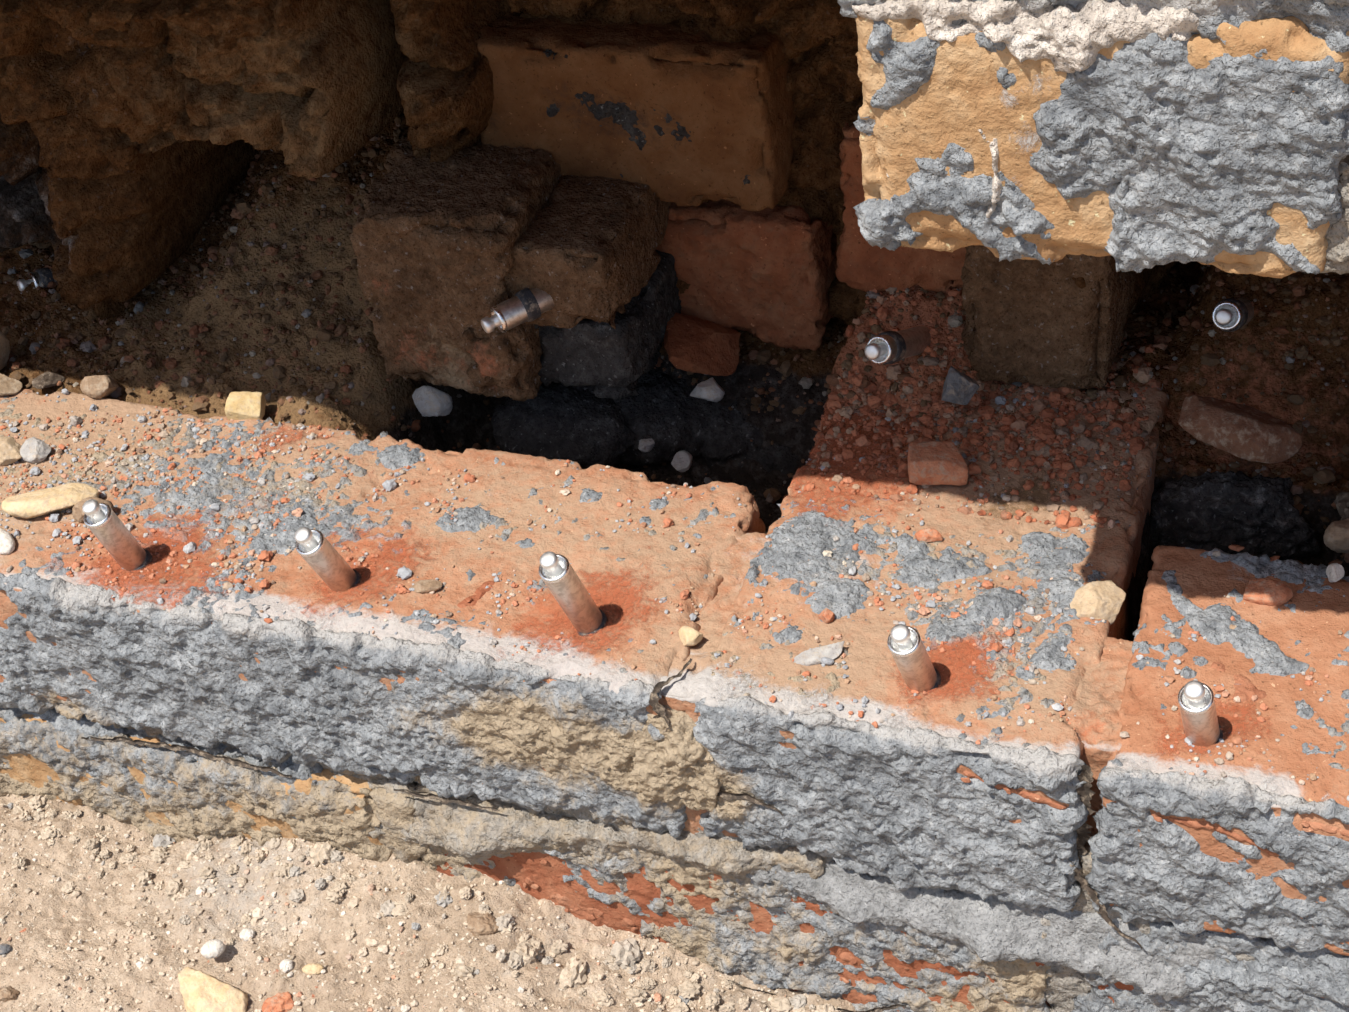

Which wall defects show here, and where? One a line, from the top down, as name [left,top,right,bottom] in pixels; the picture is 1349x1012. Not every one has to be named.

crack [1339,155,1349,187]
spalling [462,175,741,400]
spalling [225,391,266,420]
crack [649,658,692,749]
spalling [1151,812,1277,856]
spalling [1301,821,1349,837]
crack [1063,765,1143,950]
spalling [523,877,638,931]
spalling [839,952,858,984]